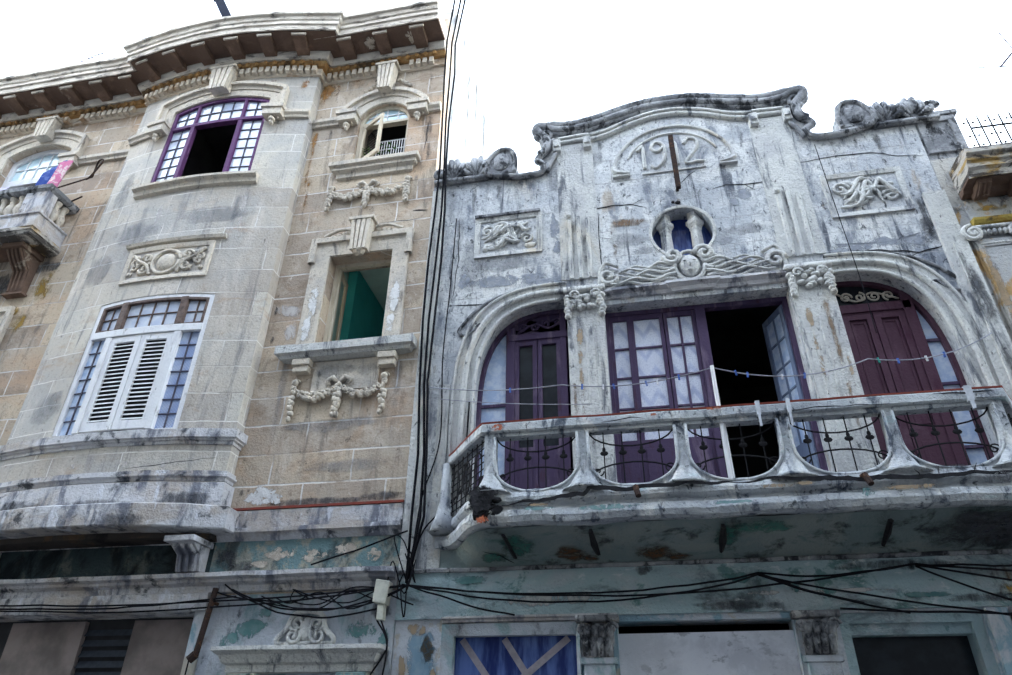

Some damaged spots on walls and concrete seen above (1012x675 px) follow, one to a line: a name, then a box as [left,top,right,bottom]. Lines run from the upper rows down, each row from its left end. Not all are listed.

water stain [472,190,540,220]
water stain [34,262,60,298]
water stain [959,253,996,318]
water stain [0,502,34,517]
water stain [58,500,141,526]
water stain [159,492,209,504]
spalling [467,485,503,523]
peeling [251,542,381,568]
water stain [952,593,1012,601]
peeling [398,624,436,675]